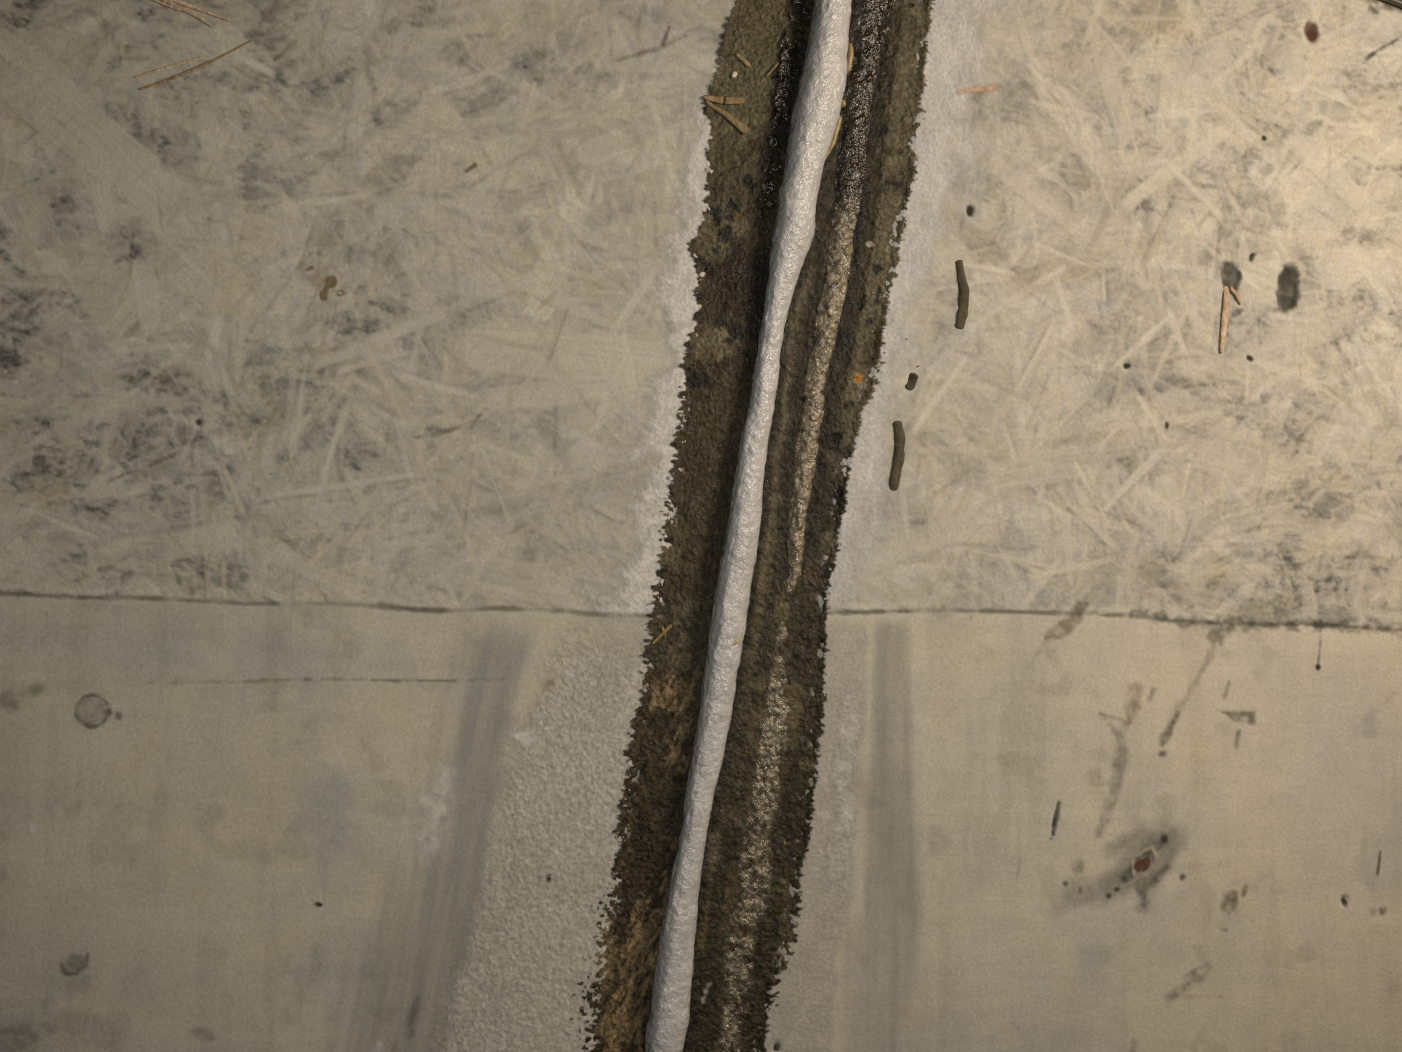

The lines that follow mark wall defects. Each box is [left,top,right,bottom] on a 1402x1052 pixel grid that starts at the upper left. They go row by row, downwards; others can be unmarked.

damp [571,0,814,1052]
damp [682,0,935,1052]
rust [1107,836,1167,897]